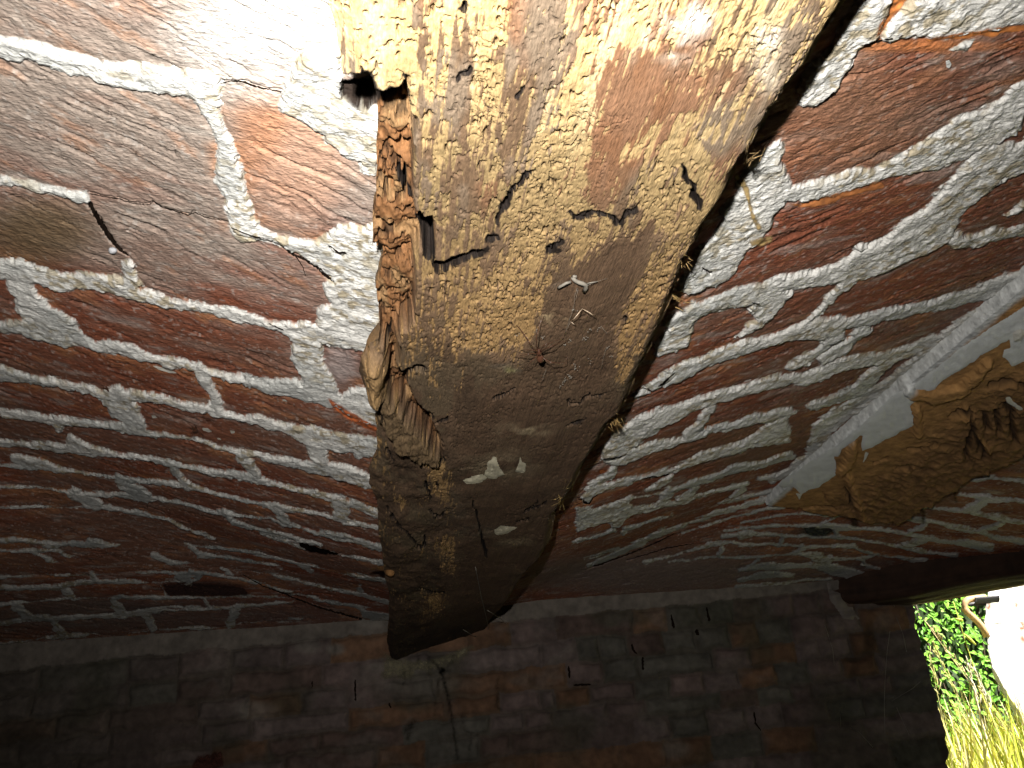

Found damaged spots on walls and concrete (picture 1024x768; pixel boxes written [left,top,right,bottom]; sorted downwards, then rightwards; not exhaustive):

crack [88,193,347,281]
peeling [779,307,1024,499]